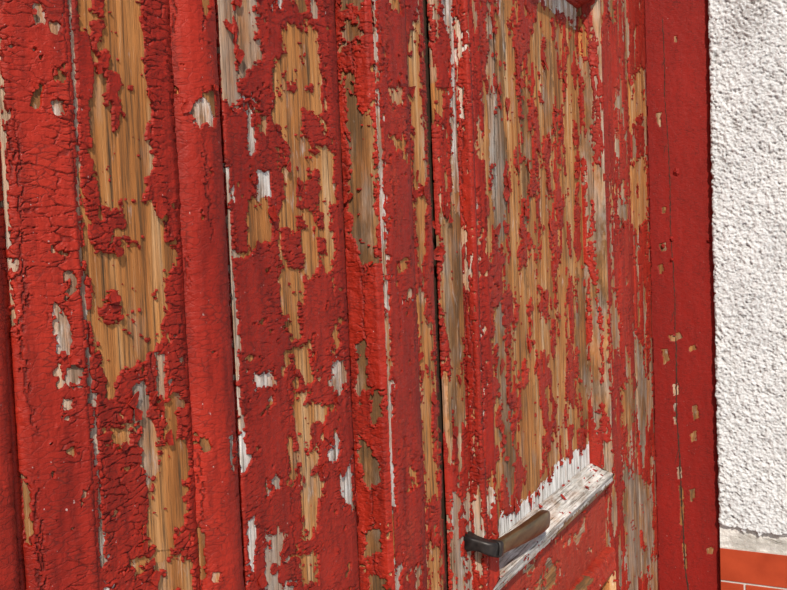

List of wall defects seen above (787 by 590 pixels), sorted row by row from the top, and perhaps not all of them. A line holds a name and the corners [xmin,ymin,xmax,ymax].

peeling [0,74,20,326]
peeling [20,474,36,548]
peeling [30,0,225,590]
peeling [181,0,470,590]
peeling [361,0,655,590]
peeling [626,64,662,135]